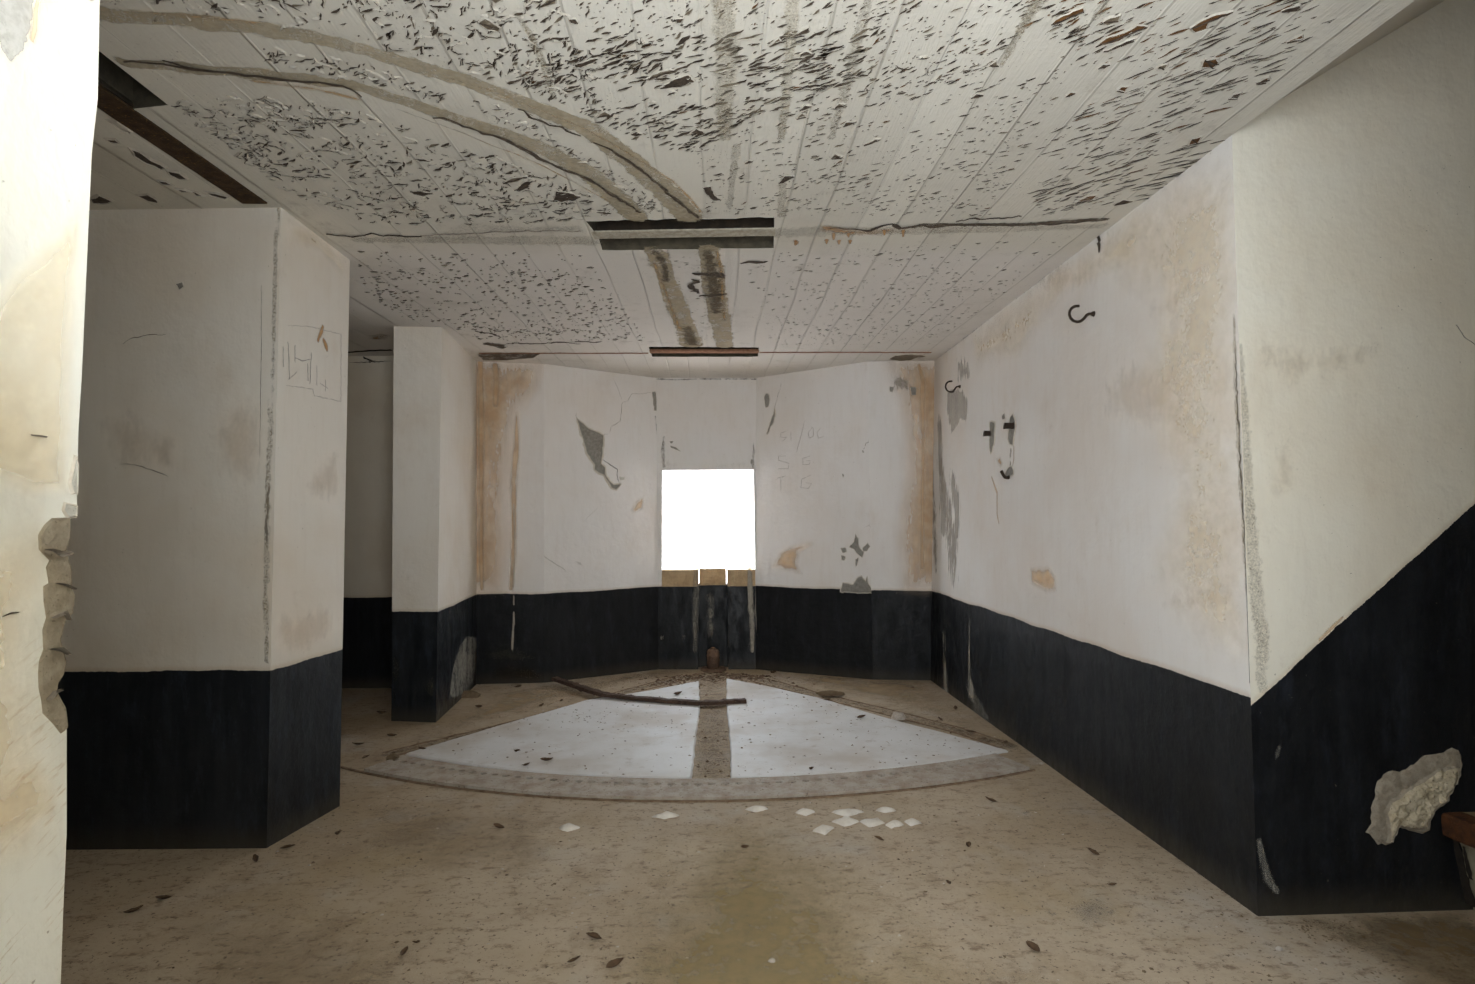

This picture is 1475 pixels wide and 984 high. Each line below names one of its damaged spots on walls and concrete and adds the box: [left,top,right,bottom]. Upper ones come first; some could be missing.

flaking render [0,0,39,61]
peeling [90,194,116,205]
peeling [103,118,229,204]
peeling [150,0,1335,226]
peeling [357,251,644,349]
peeling [675,257,727,340]
peeling [749,242,1054,361]
flaking render [576,391,657,491]
peeling [1233,320,1264,683]
spalling [38,454,79,734]
flaking render [840,534,871,594]
flaking render [1366,748,1463,845]